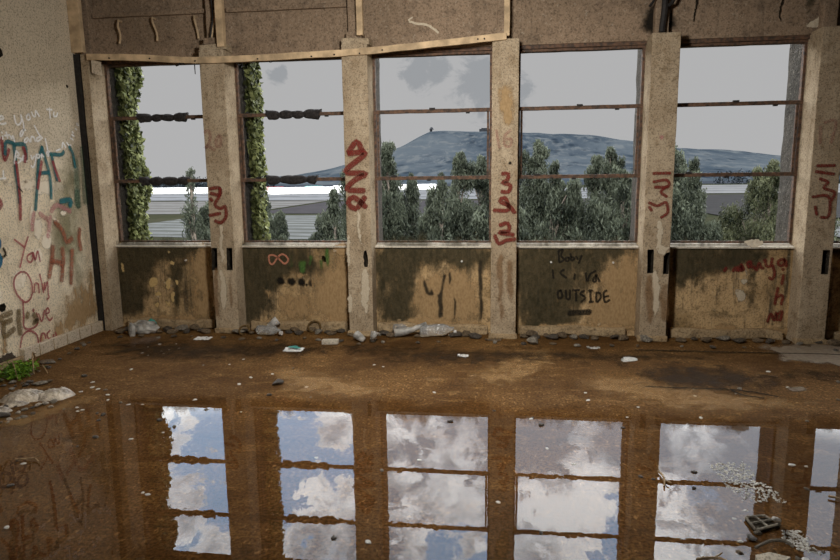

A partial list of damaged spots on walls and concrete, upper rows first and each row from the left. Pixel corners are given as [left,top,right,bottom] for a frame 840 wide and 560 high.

damp [117,238,215,319]
damp [376,235,491,322]